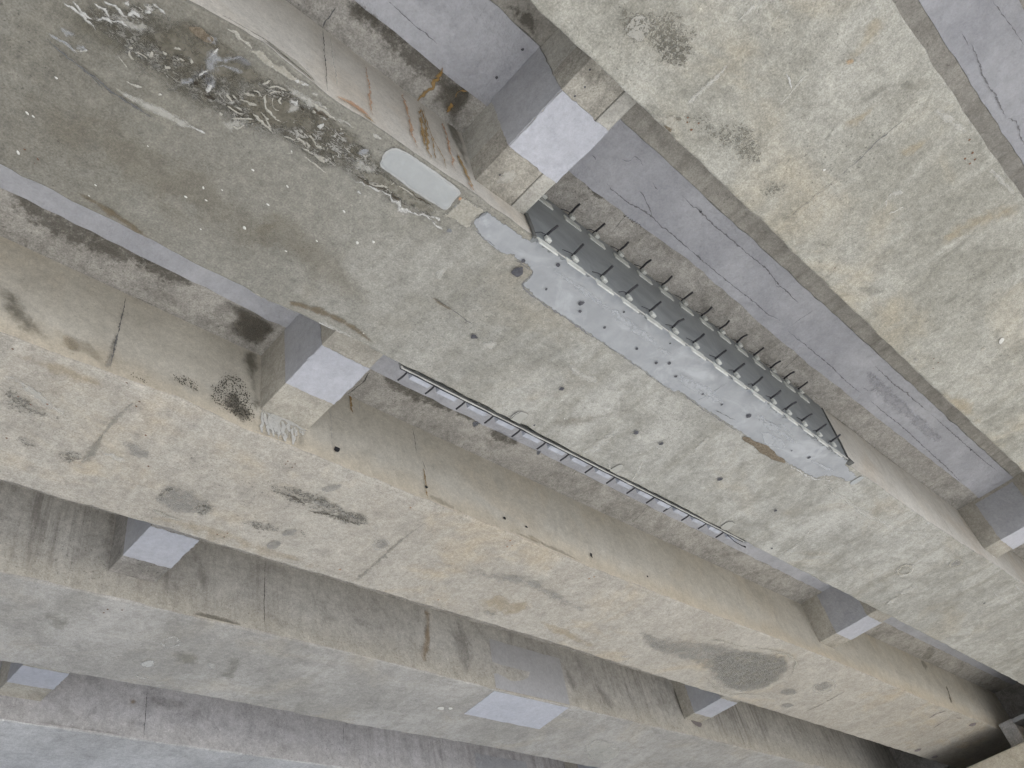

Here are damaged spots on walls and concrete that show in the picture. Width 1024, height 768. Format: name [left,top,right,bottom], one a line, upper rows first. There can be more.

efflorescence [64,1,165,27]
water stain [154,22,257,93]
water stain [244,96,366,164]
water stain [351,3,468,116]
rust [402,68,475,191]
crack [962,34,1024,144]
water stain [357,182,443,230]
crack [610,187,773,317]
crack [689,203,795,300]
water stain [211,372,307,444]
spalling [742,437,785,463]
crack [784,334,997,481]